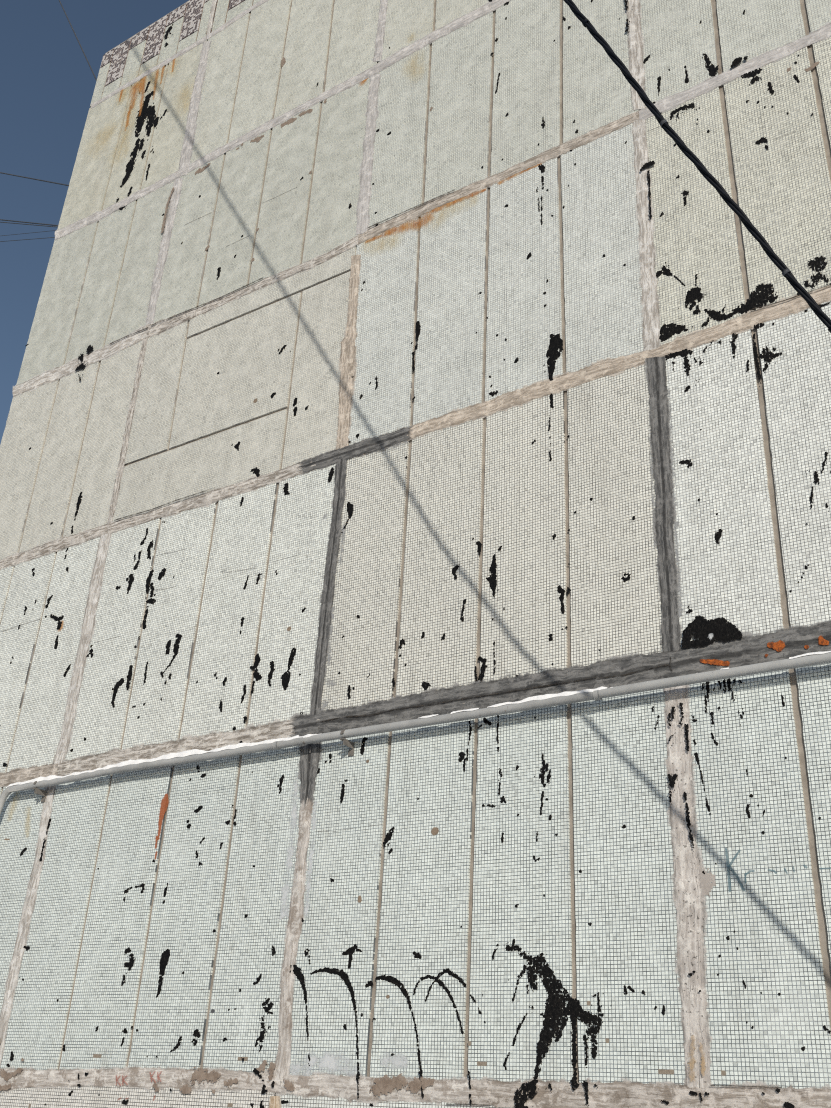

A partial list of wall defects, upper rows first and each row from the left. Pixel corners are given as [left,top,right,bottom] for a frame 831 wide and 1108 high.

corrosion [119,59,175,130]
corrosion [765,640,785,657]
corrosion [155,793,168,859]